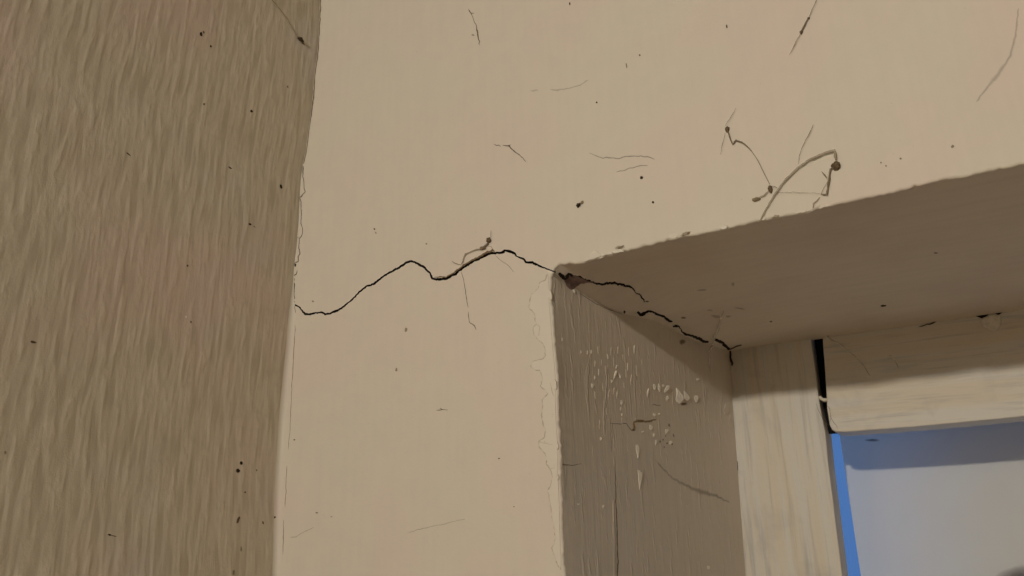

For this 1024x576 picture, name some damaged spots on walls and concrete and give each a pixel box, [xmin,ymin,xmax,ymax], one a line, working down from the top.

crack [283,0,741,543]
peeling [641,383,698,448]